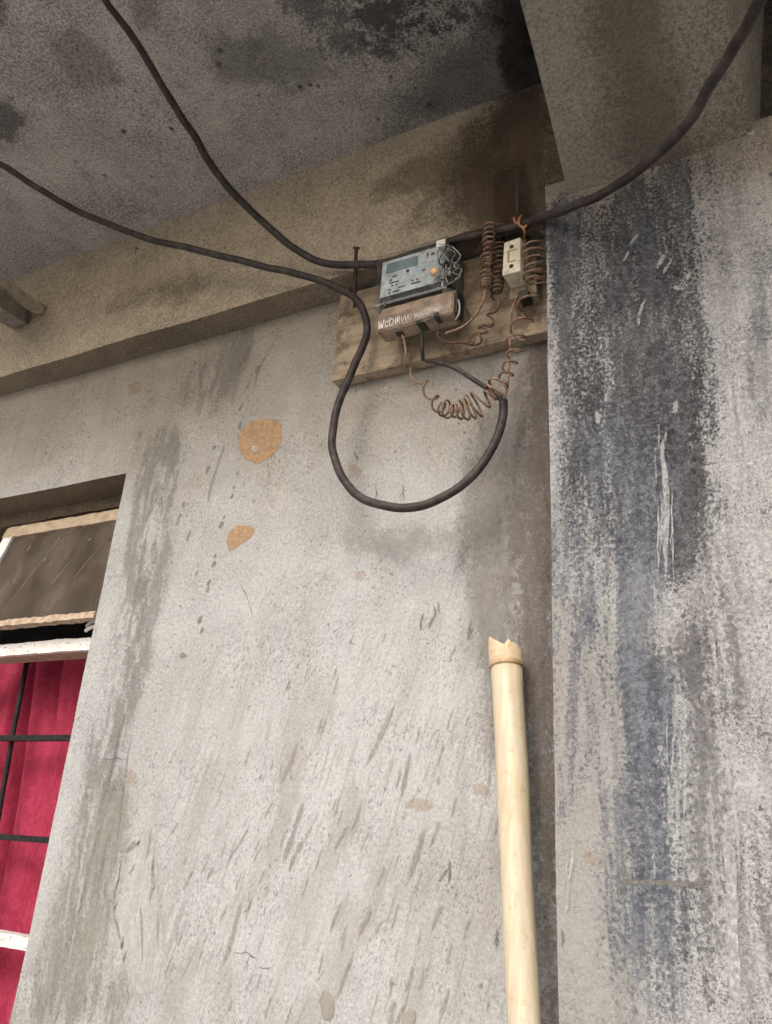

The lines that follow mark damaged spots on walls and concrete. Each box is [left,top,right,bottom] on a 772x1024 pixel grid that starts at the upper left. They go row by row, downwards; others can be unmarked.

water stain [487,0,528,41]
peeling [238,419,282,464]
peeling [227,525,255,551]
water stain [443,82,772,1024]